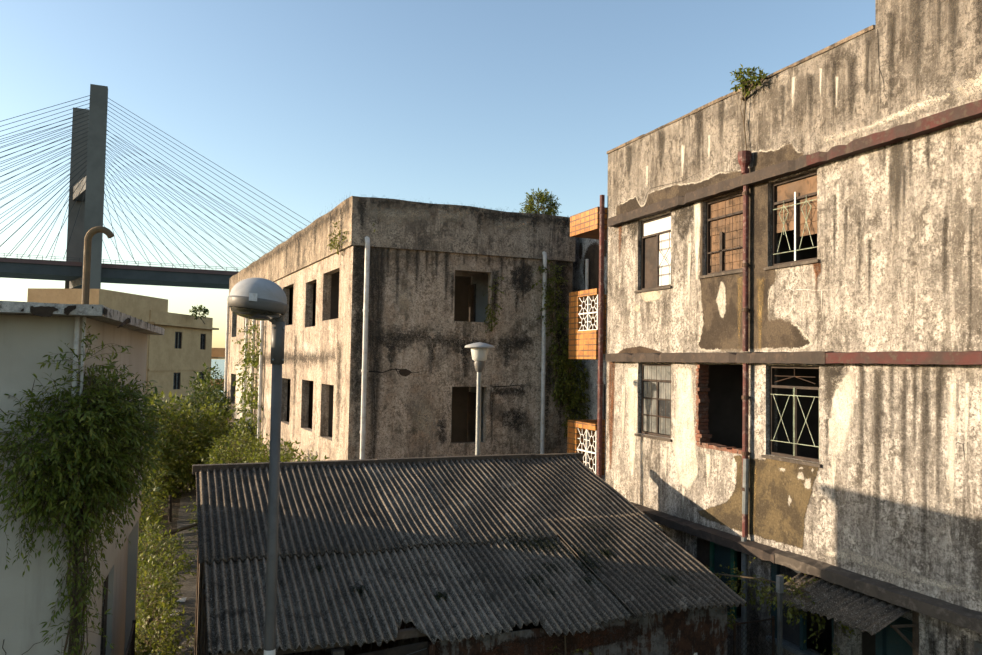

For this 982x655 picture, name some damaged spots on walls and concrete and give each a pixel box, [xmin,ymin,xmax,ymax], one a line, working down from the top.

water stain [695,103,723,157]
water stain [780,76,795,117]
water stain [807,40,868,108]
water stain [247,201,348,270]
water stain [465,207,569,237]
flaking render [615,142,814,353]
peeling [21,305,76,317]
water stain [284,245,533,459]
water stain [235,354,271,424]
water stain [824,364,982,532]
flaking render [699,455,818,548]
corrosion [476,623,643,655]